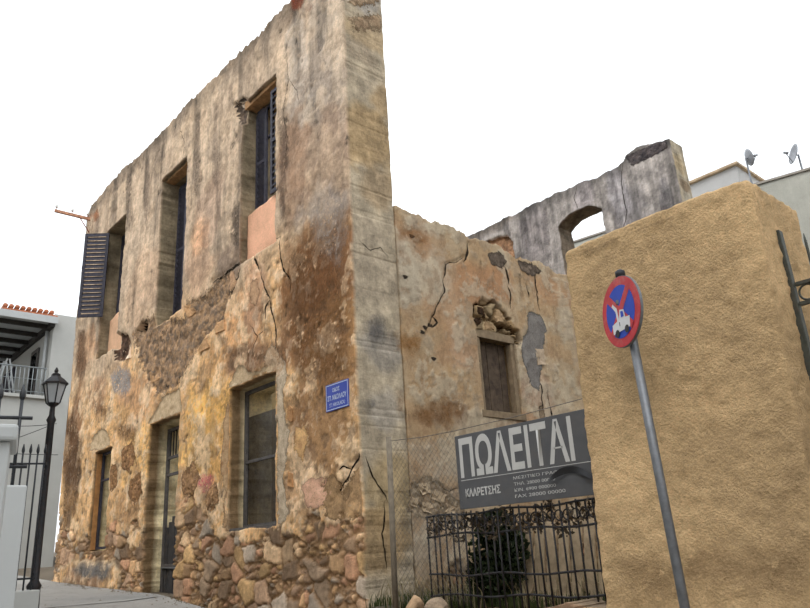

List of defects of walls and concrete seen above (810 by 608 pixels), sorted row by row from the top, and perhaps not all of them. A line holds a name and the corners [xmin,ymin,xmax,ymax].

flaking render [348,0,382,33]
crack [215,258,277,359]
crack [276,237,291,293]
crack [426,243,469,330]
flaking render [473,303,547,390]
flaking render [488,237,541,276]
damp [63,424,80,529]
crack [339,454,388,570]
flaking render [406,476,464,525]